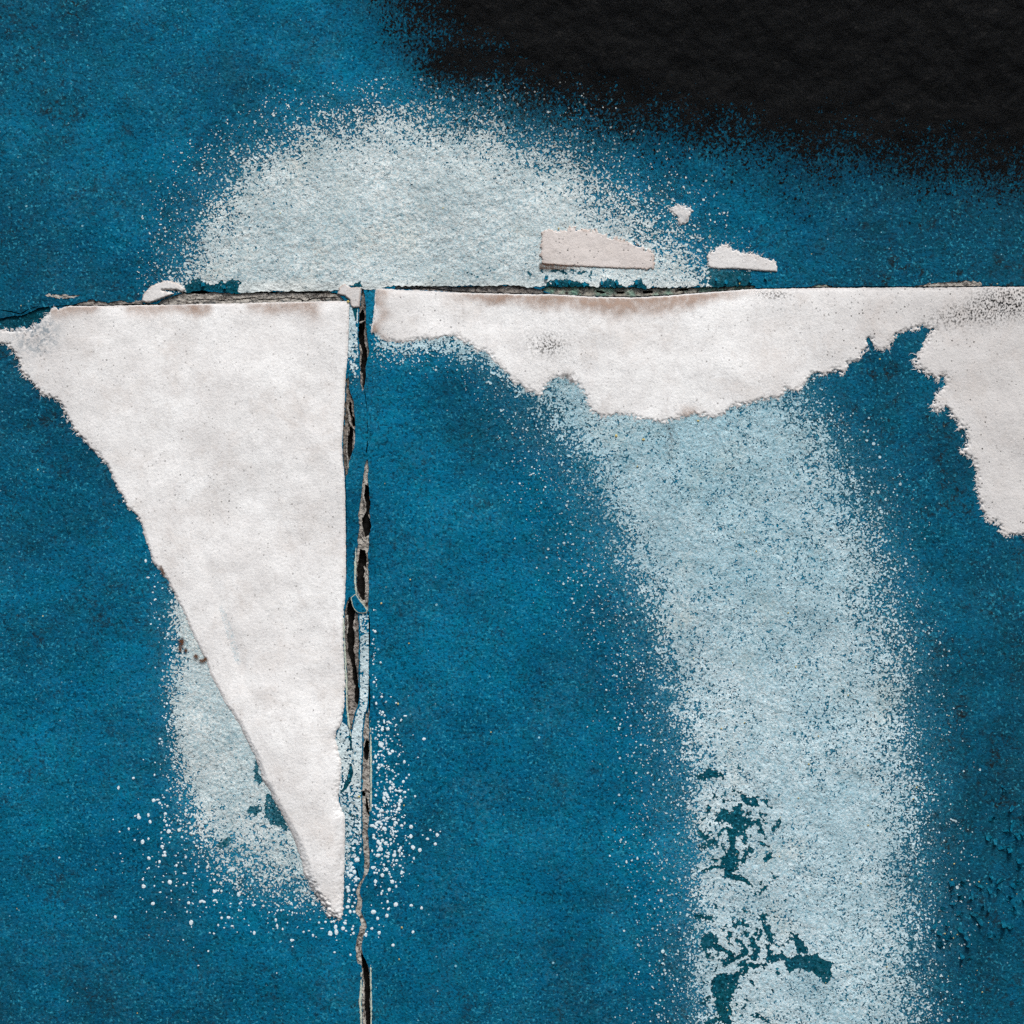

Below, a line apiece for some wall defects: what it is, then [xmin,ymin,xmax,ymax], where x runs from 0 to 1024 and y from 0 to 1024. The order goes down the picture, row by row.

crack [45,282,372,1024]
peeling [0,226,1024,924]
crack [395,275,982,298]
peeling [932,805,1024,960]